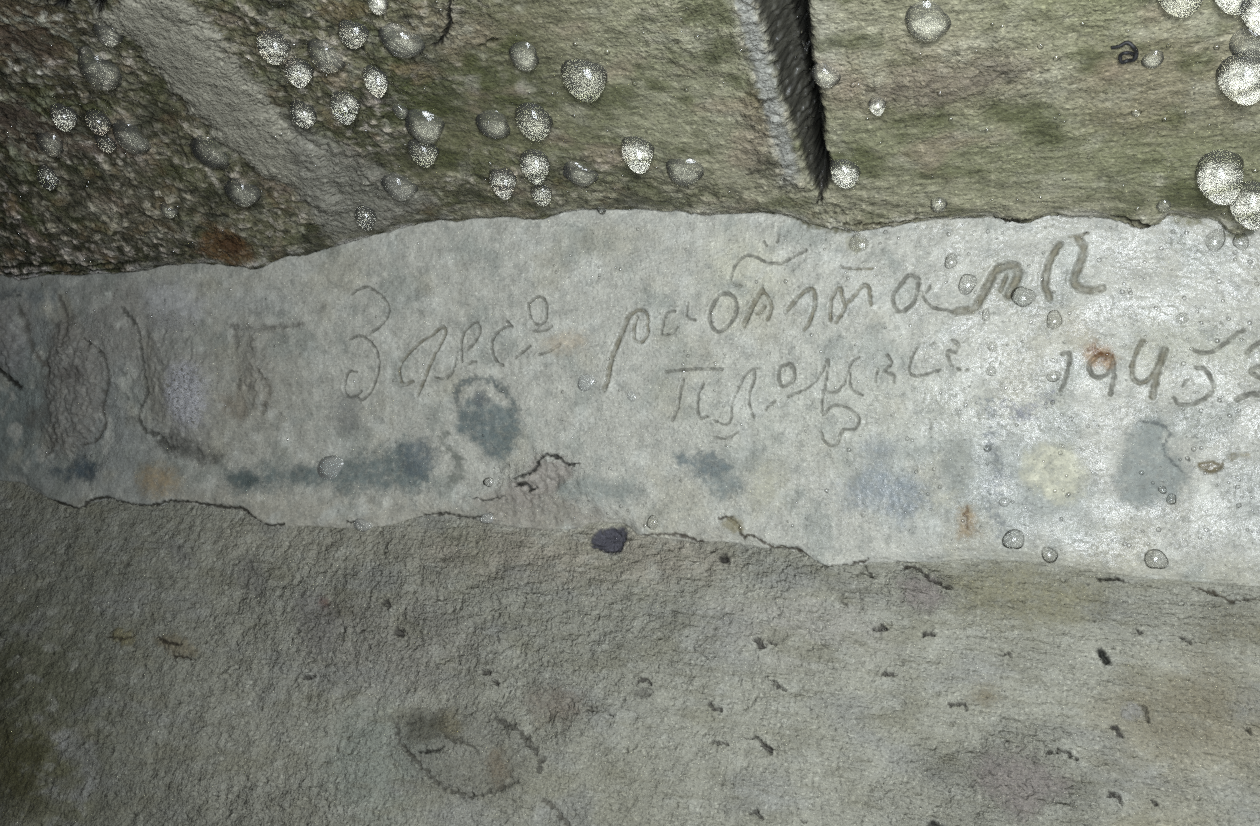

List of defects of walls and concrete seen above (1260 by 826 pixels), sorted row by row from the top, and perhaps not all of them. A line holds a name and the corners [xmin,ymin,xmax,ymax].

crack [736,0,832,203]
crack [843,217,932,227]
crack [994,215,1031,223]
crack [1115,216,1151,228]
damp [165,364,205,425]
damp [440,376,519,484]
damp [228,442,431,490]
damp [1116,421,1185,507]